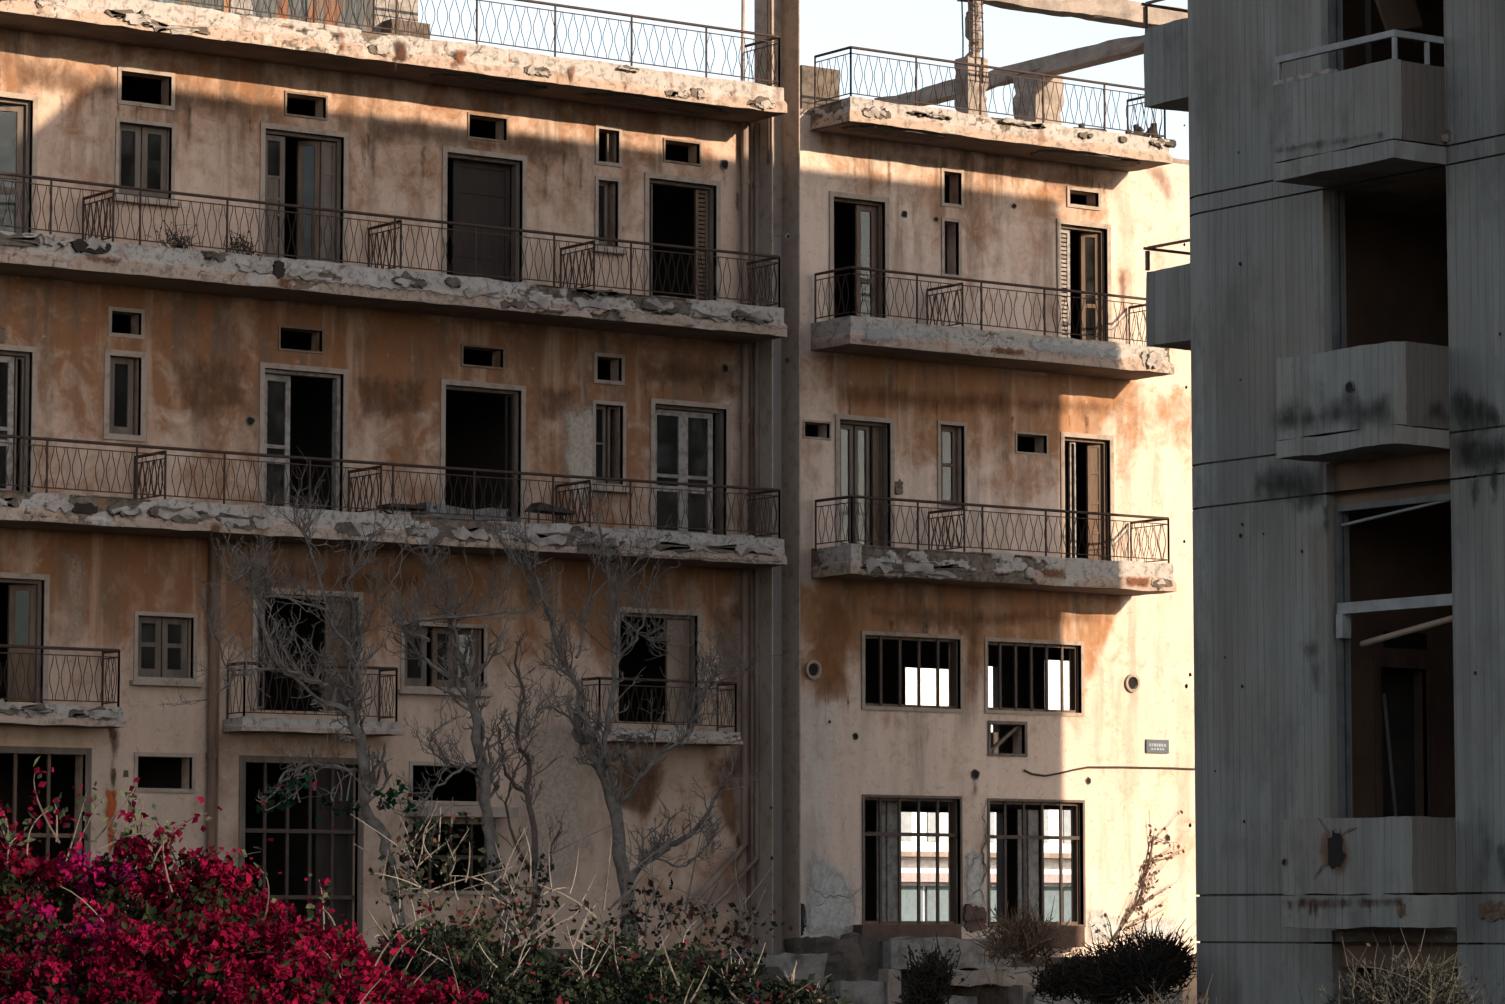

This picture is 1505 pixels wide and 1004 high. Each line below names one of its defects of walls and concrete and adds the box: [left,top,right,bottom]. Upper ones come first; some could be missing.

spalling [367,43,390,57]
spalling [430,65,552,93]
spalling [617,64,640,73]
spalling [581,88,730,115]
spalling [747,96,776,111]
spalling [0,232,112,254]
spalling [203,251,318,281]
spalling [391,271,551,309]
leakage [1432,395,1505,499]
spalling [44,496,273,532]
spalling [860,557,972,580]
spalling [1151,577,1173,590]